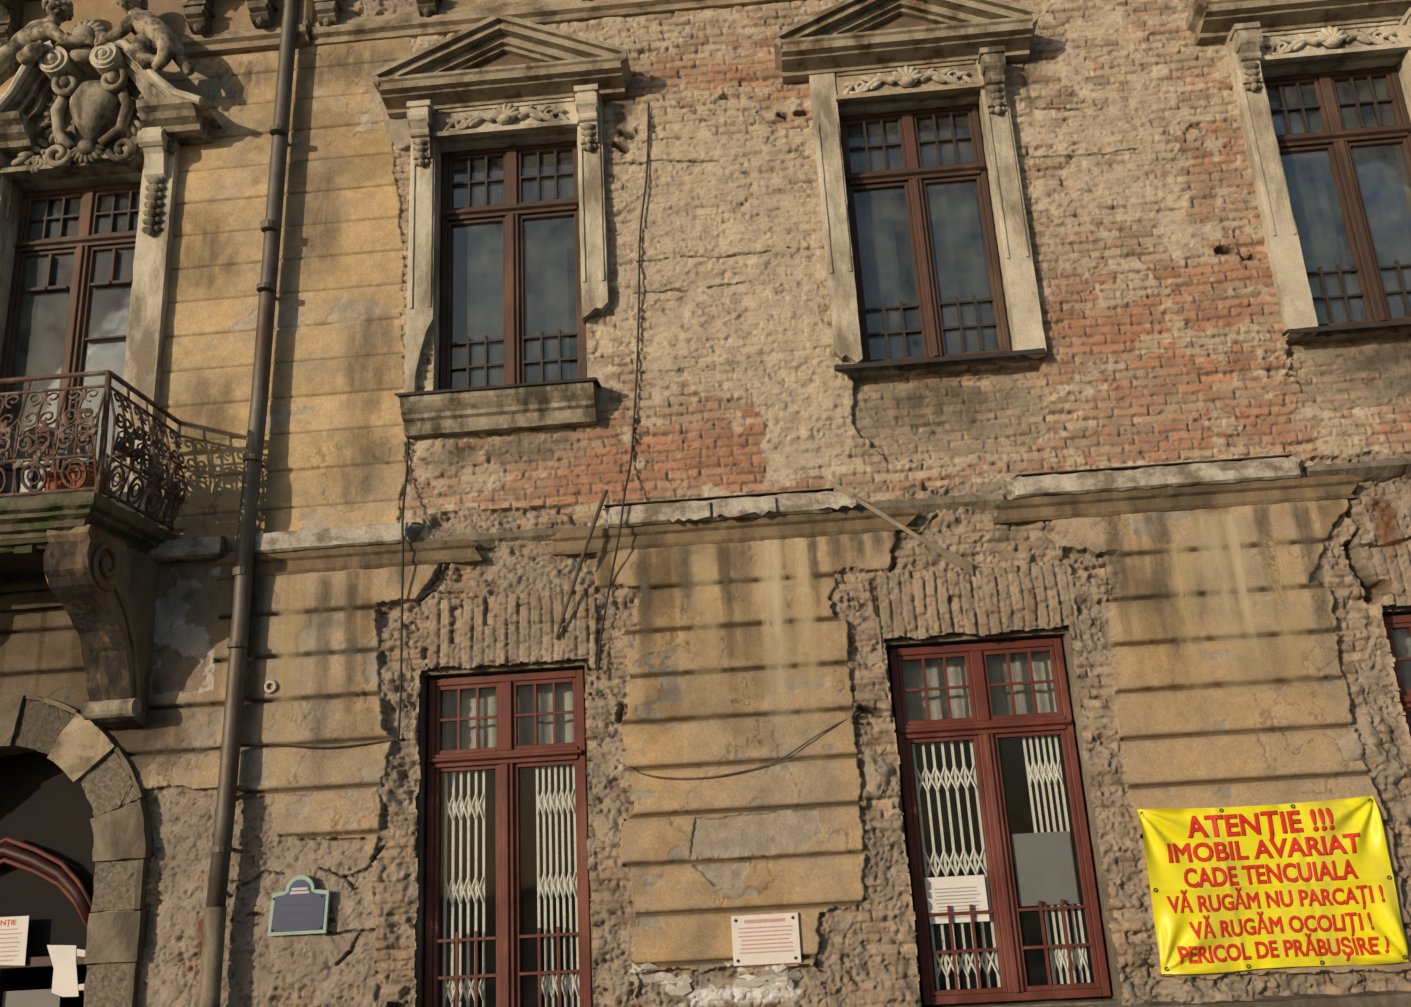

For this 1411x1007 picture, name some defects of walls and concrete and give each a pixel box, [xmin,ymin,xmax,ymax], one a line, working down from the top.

flaking render [621,10,813,143]
flaking render [378,101,411,151]
flaking render [1037,260,1411,471]
flaking render [151,559,224,695]
water stain [765,539,781,637]
water stain [796,531,895,603]
water stain [1213,515,1249,612]
crack [1346,506,1411,548]
flaking render [220,364,1411,1007]
flaking render [135,784,218,1007]
crack [227,845,385,921]
crack [327,928,376,964]